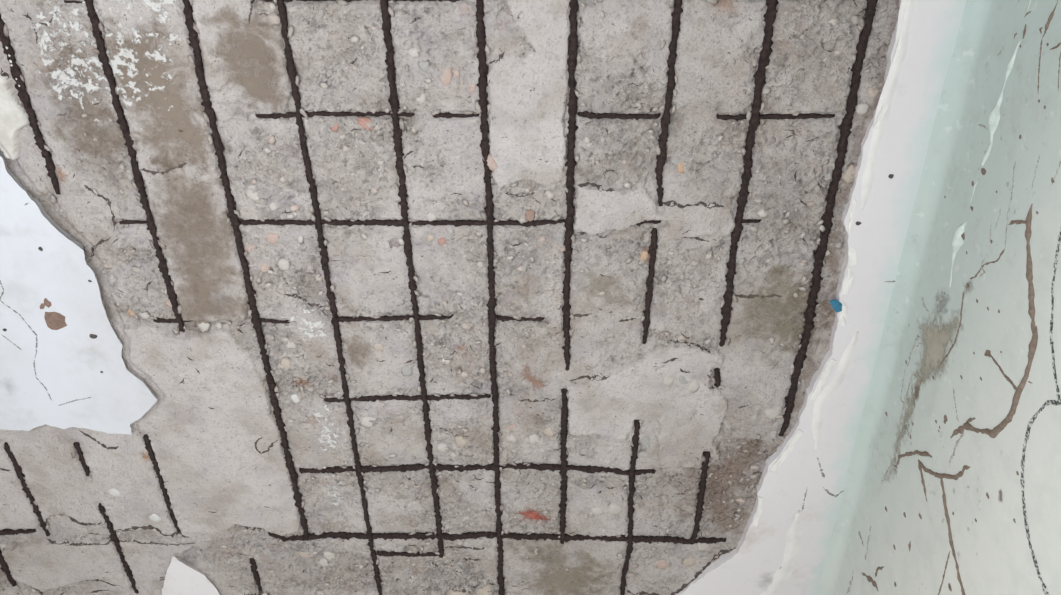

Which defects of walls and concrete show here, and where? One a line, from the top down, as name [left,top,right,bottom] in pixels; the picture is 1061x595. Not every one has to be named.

spalling [0,0,500,595]
rust [518,510,548,520]
spalling [388,0,900,595]